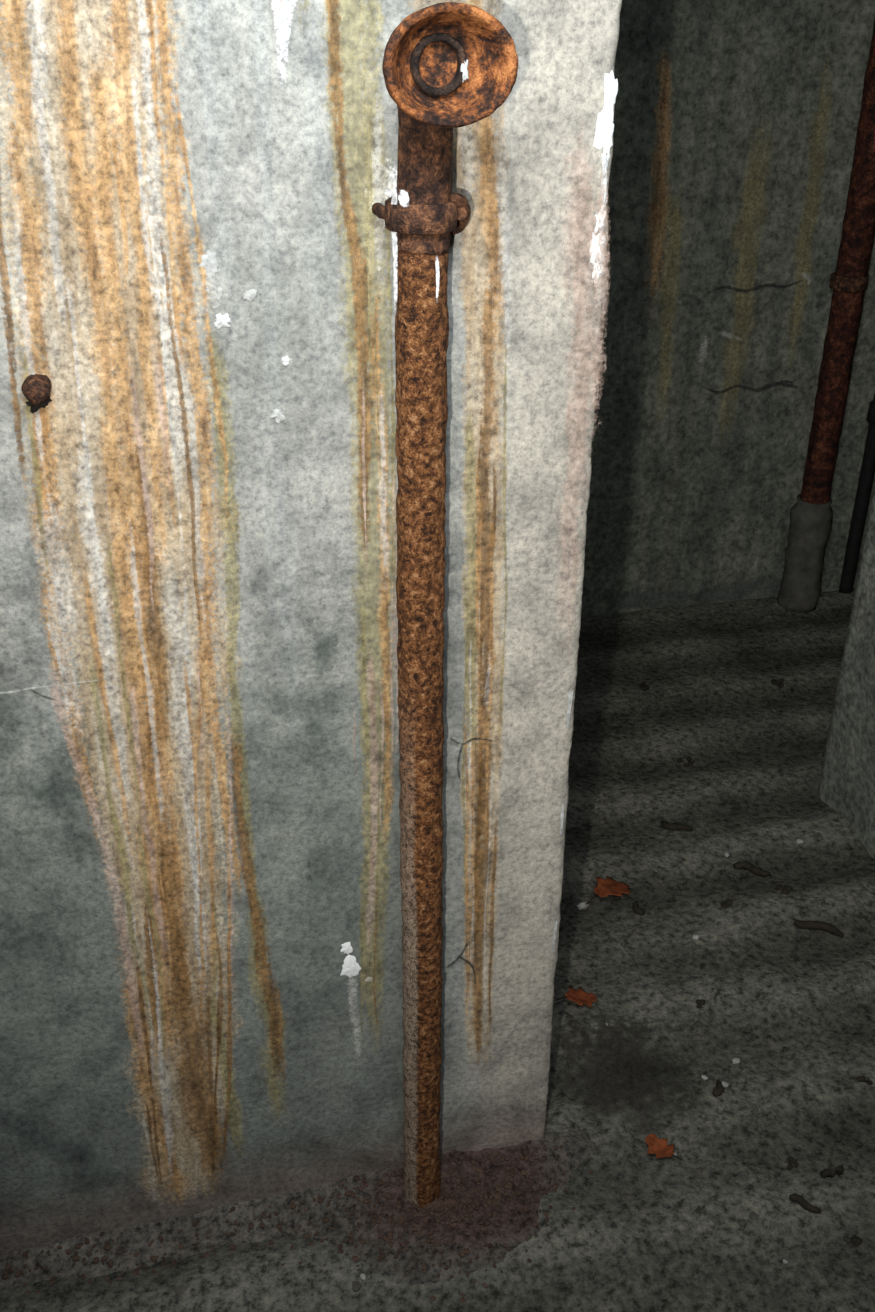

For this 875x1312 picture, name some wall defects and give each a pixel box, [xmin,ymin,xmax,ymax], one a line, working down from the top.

corrosion [414,0,500,15]
corrosion [0,0,285,1205]
corrosion [452,106,508,1058]